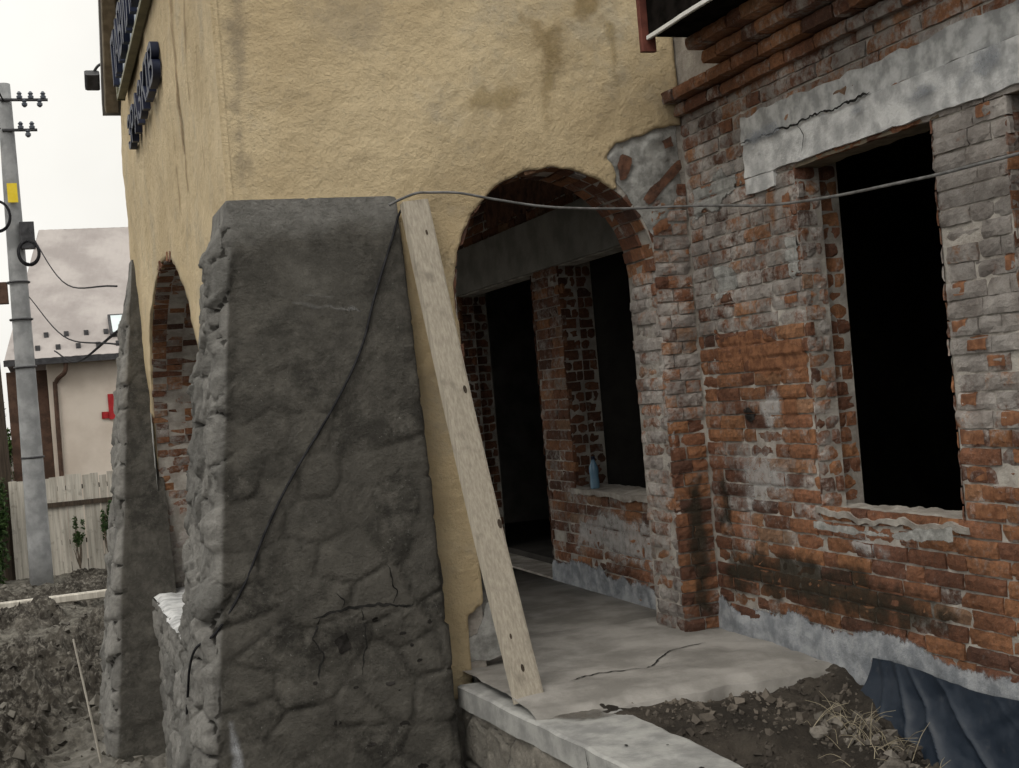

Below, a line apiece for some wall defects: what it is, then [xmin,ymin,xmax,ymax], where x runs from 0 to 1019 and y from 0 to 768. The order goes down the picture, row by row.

crack [740,92,869,152]
peeling [607,125,742,238]
peeling [713,265,738,307]
peeling [784,237,801,303]
damp [762,391,779,426]
damp [685,476,711,612]
damp [852,539,874,554]
crack [312,565,413,677]
damp [728,551,955,630]